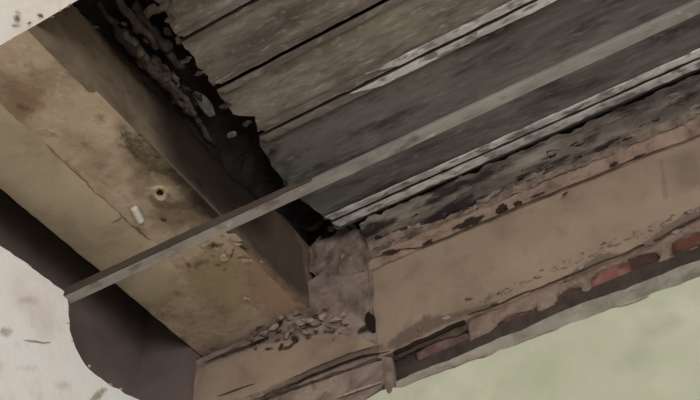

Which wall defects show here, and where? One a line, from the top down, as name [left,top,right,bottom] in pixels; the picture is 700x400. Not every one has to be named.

spalling [37,0,294,199]
crack [47,145,151,241]
flaking render [275,74,700,279]
flaking render [465,199,700,308]
flaking render [393,314,469,361]